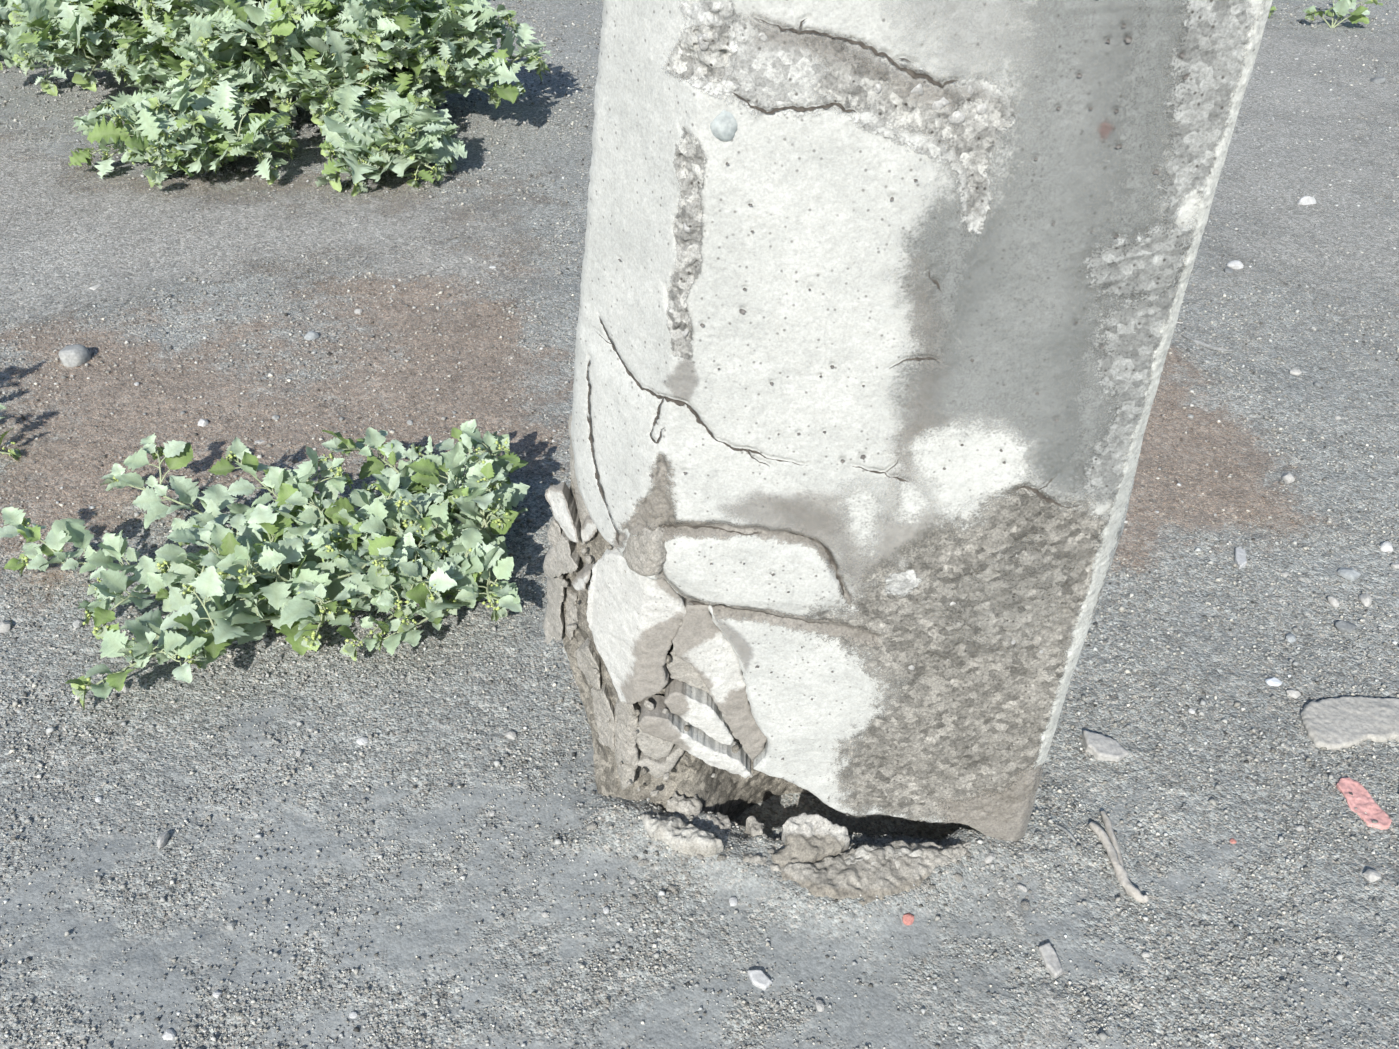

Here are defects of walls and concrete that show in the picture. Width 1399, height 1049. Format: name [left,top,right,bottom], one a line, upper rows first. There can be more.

spalling [543,412,812,820]
crack [586,317,799,545]
crack [663,525,844,597]
crack [689,601,822,624]
spalling [662,0,1015,359]
crack [853,459,908,482]
crack [889,357,937,369]
spalling [804,0,1265,822]
water stain [892,0,1191,501]